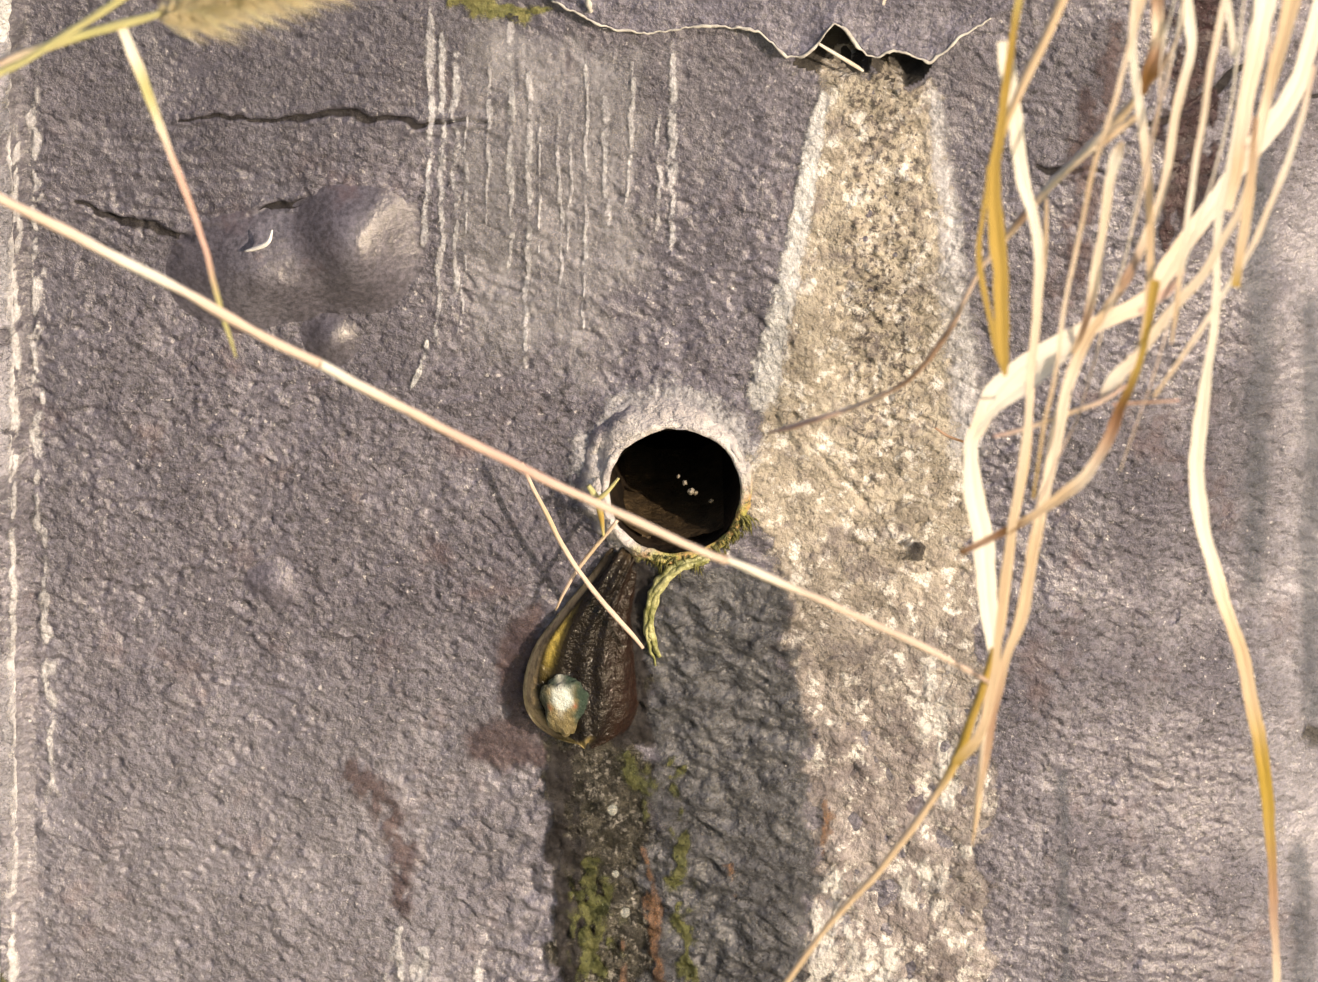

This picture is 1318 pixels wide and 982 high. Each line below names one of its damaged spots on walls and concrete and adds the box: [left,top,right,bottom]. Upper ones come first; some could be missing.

crack [178,108,487,130]
leakage [410,8,469,388]
leakage [485,22,637,366]
leakage [655,43,678,247]
spalling [552,0,1024,982]
leakage [540,556,921,982]
leakage [900,857,946,910]
leakage [920,655,959,810]